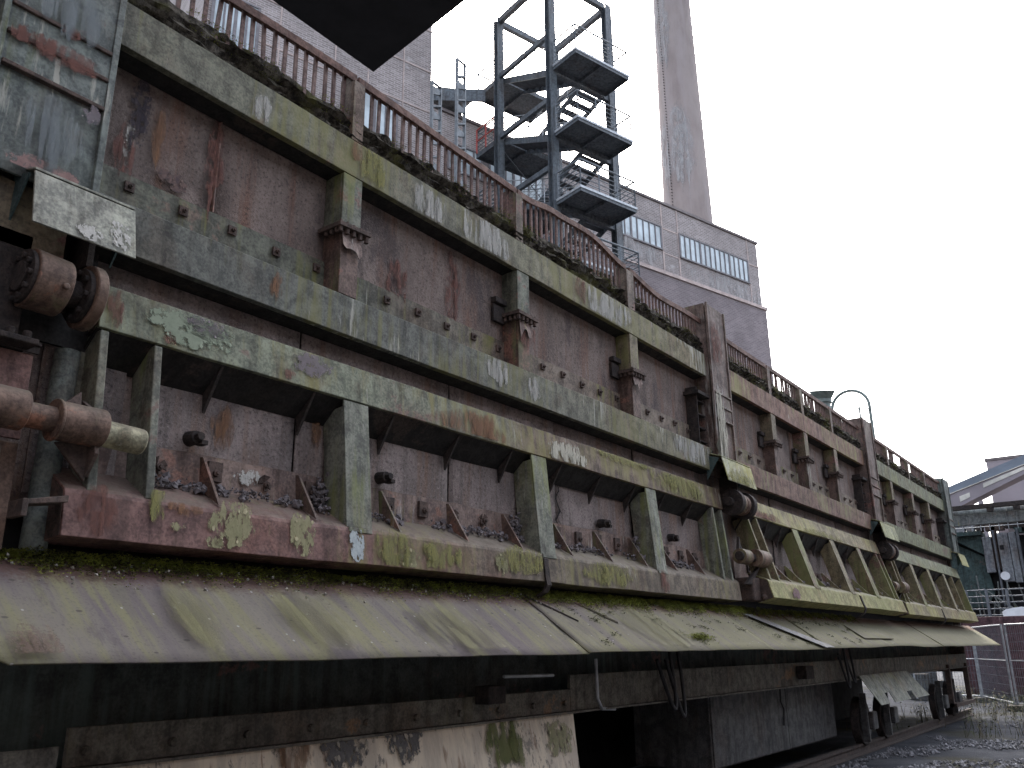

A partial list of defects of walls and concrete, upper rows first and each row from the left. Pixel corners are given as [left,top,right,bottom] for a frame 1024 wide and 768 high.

corrosion [11,24,96,78]
peeling [76,220,132,251]
peeling [147,307,234,353]
peeling [548,441,587,467]
peeling [233,469,260,486]
peeling [350,529,364,562]
peeling [320,739,369,768]
peeling [385,732,423,765]
damp [486,721,525,768]